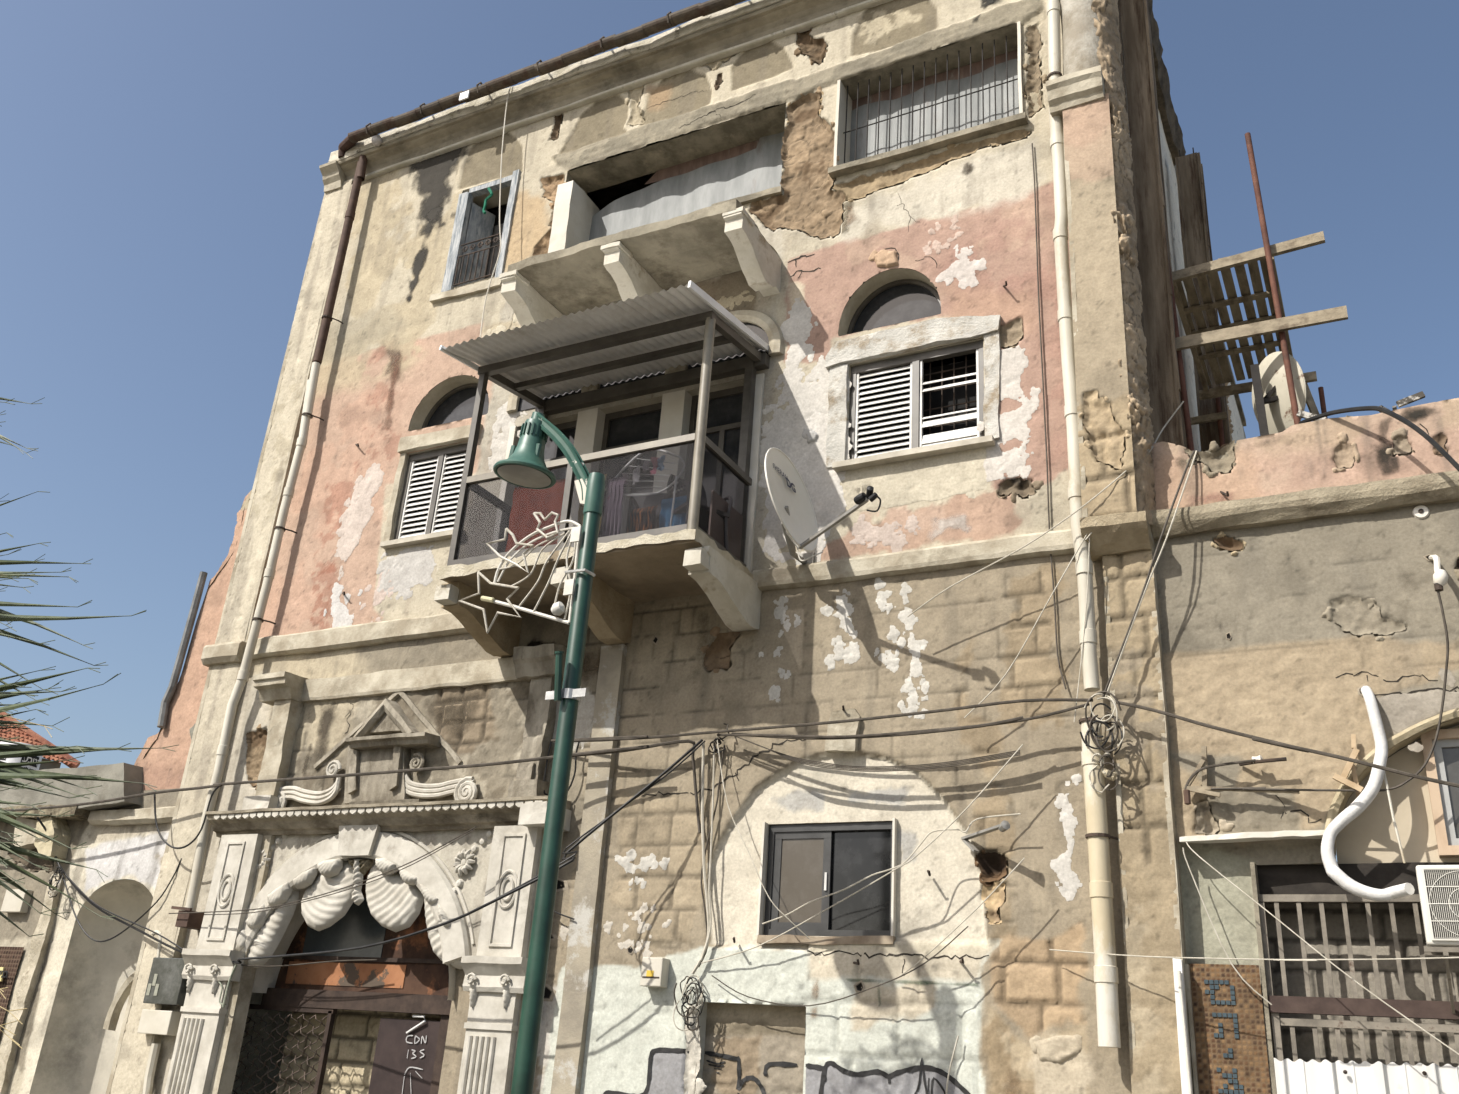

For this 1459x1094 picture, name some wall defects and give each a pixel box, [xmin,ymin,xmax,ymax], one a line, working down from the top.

flaking render [749,25,1047,239]
damp [406,146,467,301]
peeling [922,215,987,289]
flaking render [1078,0,1156,525]
peeling [758,297,1044,563]
peeling [323,463,437,628]
peeling [759,596,802,703]
peeling [820,577,929,719]
crack [1335,671,1459,696]
peeling [603,849,672,957]
flaking render [974,849,1007,925]
peeling [1050,774,1083,901]